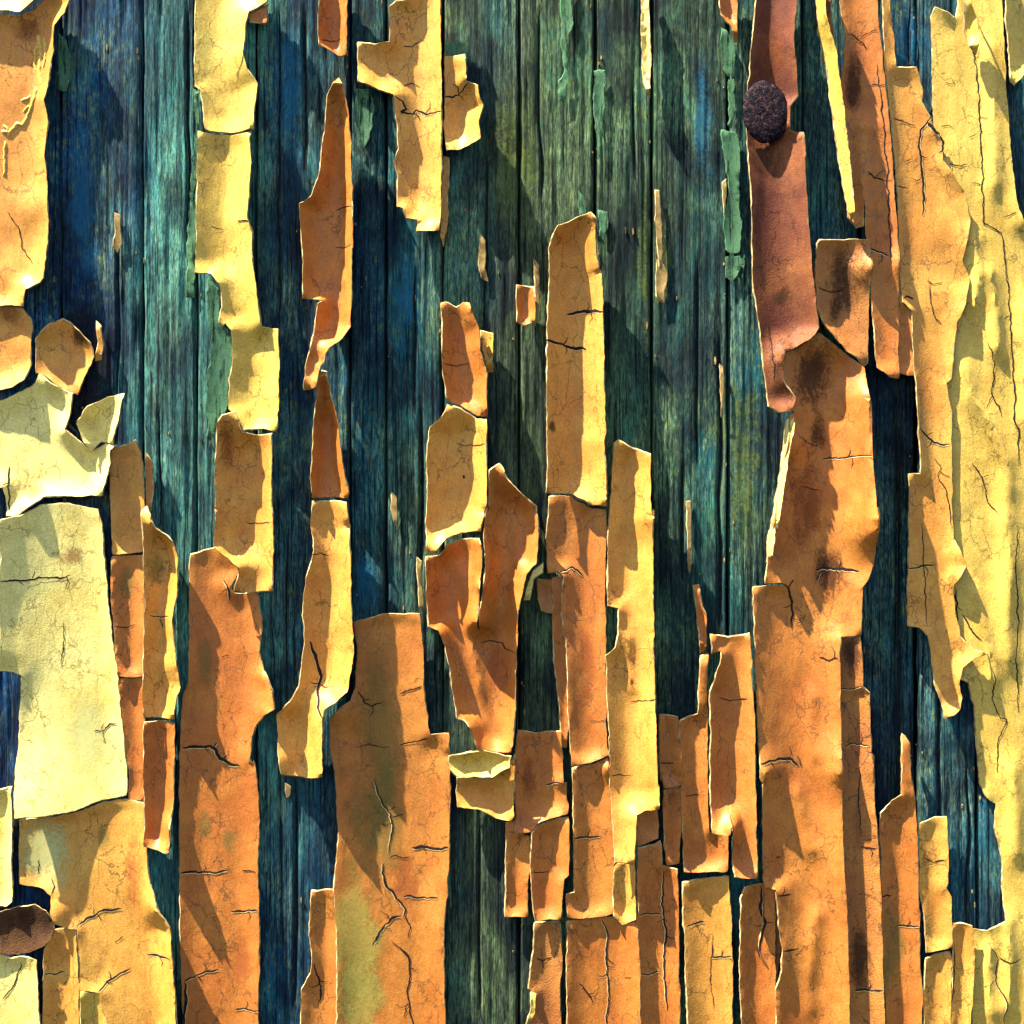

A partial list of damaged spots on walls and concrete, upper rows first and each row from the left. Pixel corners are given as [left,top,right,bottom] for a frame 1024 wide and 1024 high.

crack [395,83,468,121]
crack [8,213,33,264]
crack [849,29,1020,457]
crack [546,302,603,354]
peeling [0,0,280,1024]
peeling [276,0,1024,1024]
crack [972,463,999,515]
crack [784,561,858,629]
crack [309,641,325,721]
crack [182,743,240,767]
crack [761,746,801,767]
crack [372,780,448,1024]